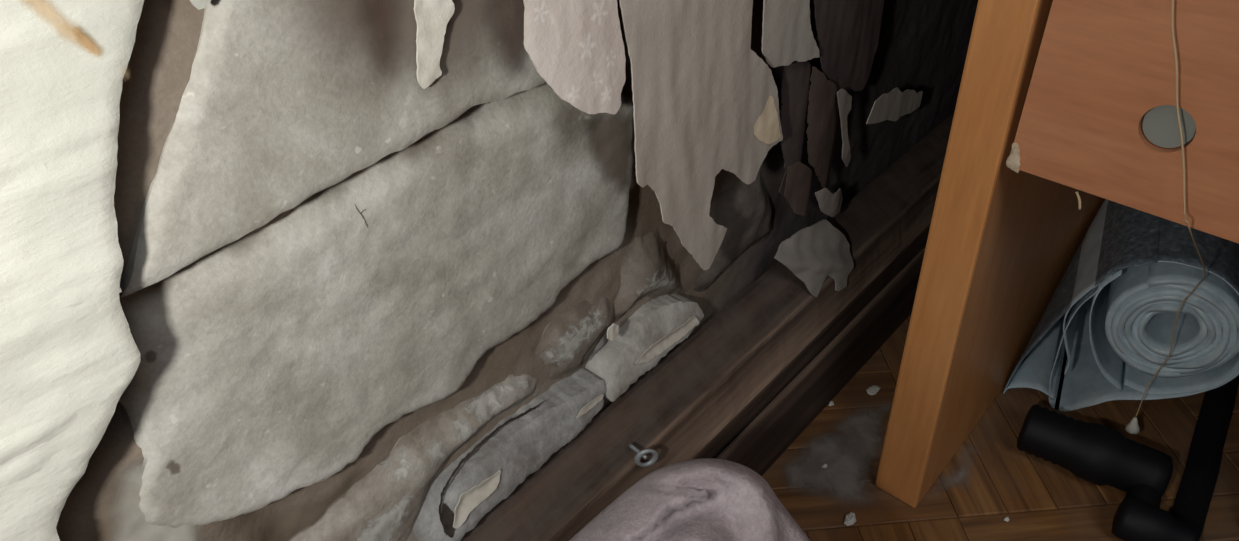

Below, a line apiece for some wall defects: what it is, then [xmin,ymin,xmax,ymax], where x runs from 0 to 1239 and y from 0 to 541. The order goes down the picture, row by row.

corrosion [24,0,98,54]
peeling [190,0,211,10]
peeling [414,0,455,89]
crack [439,401,545,538]